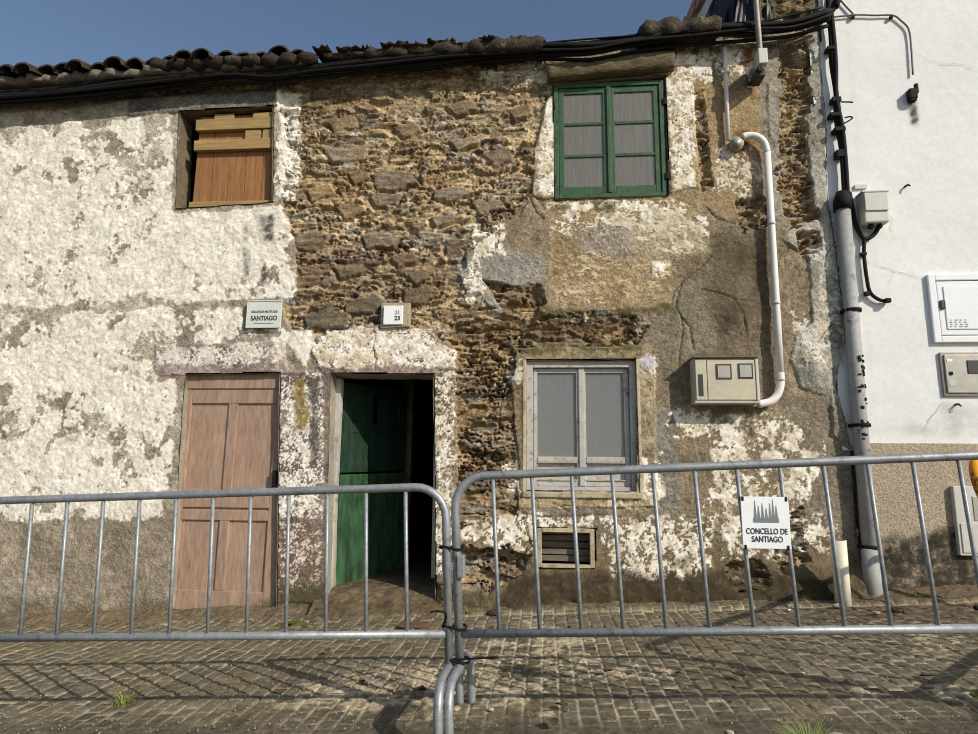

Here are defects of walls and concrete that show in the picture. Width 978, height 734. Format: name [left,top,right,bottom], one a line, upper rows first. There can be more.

peeling [0,41,844,594]
crack [672,259,747,368]
damp [881,530,978,588]